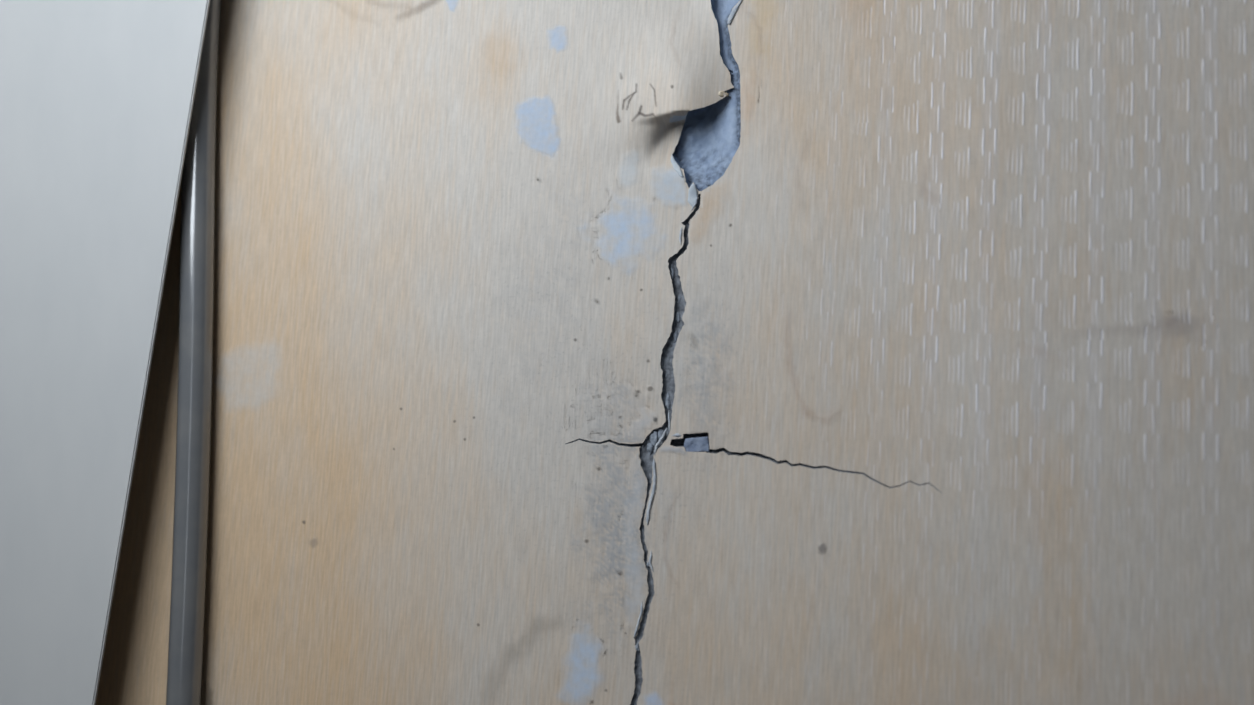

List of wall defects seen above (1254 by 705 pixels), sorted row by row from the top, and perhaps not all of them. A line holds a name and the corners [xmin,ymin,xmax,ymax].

peeling [512,92,563,158]
spalling [645,0,742,212]
crack [565,194,942,705]
peeling [552,619,609,705]
peeling [639,689,664,705]